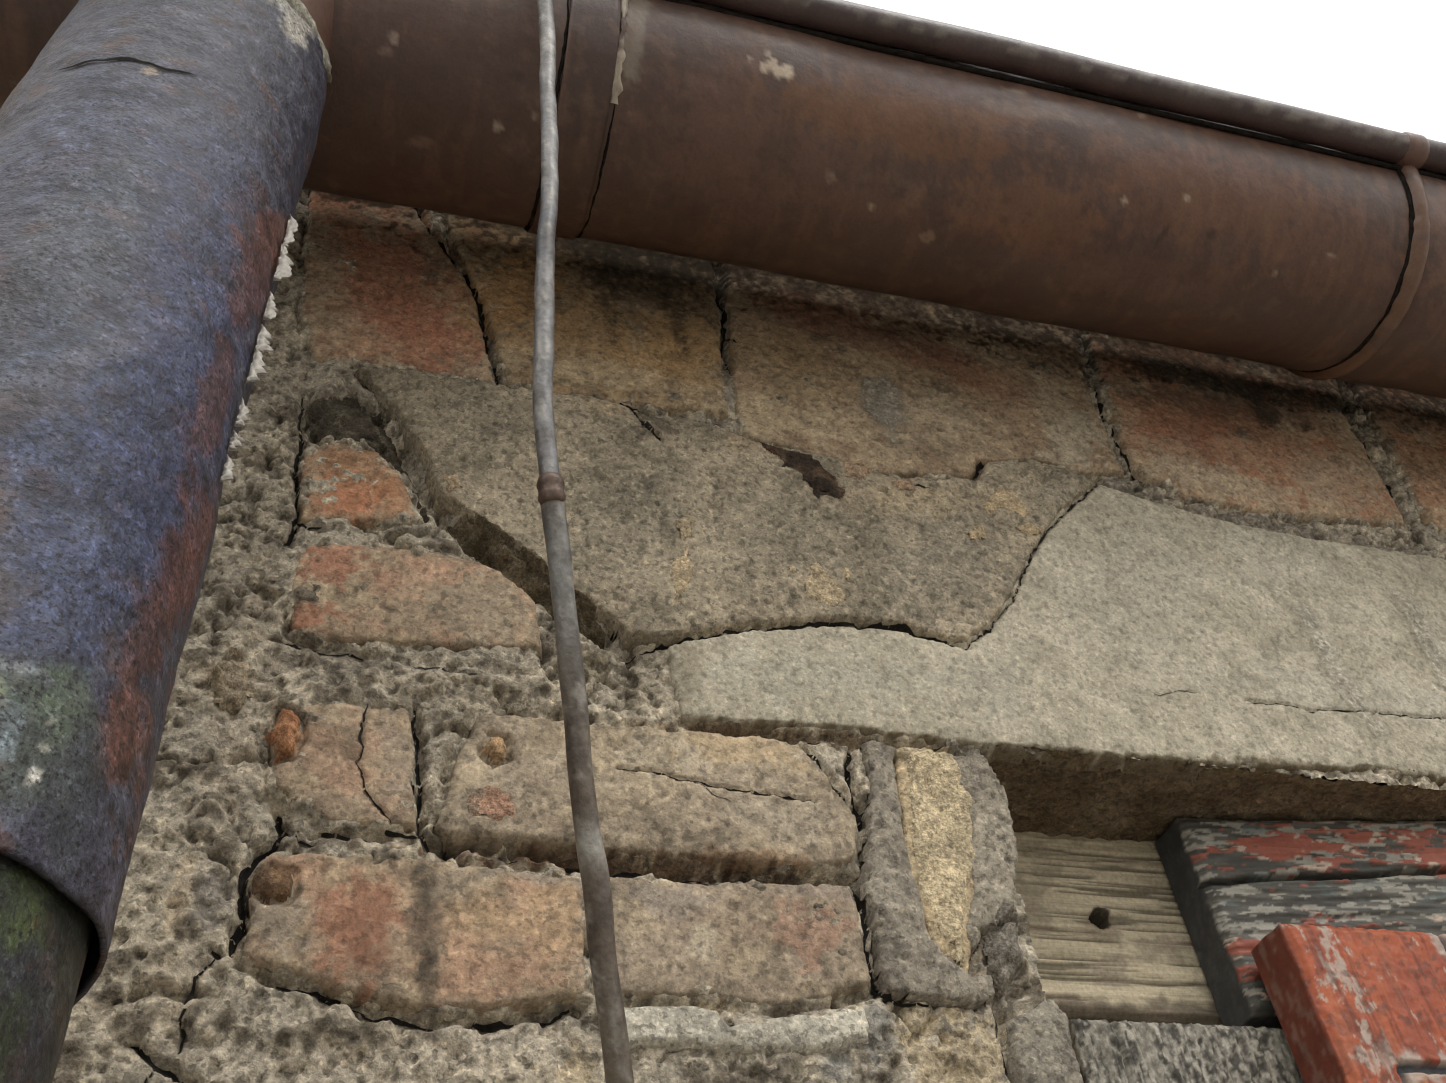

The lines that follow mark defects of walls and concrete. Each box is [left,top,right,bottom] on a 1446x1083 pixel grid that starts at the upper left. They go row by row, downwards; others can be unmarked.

crack [414,208,499,385]
crack [715,299,737,374]
crack [283,398,322,547]
spalling [759,441,876,499]
crack [972,461,984,481]
crack [1091,387,1135,480]
crack [625,485,1097,665]
crack [131,703,457,1083]
crack [564,868,643,878]
crack [471,1010,570,1033]